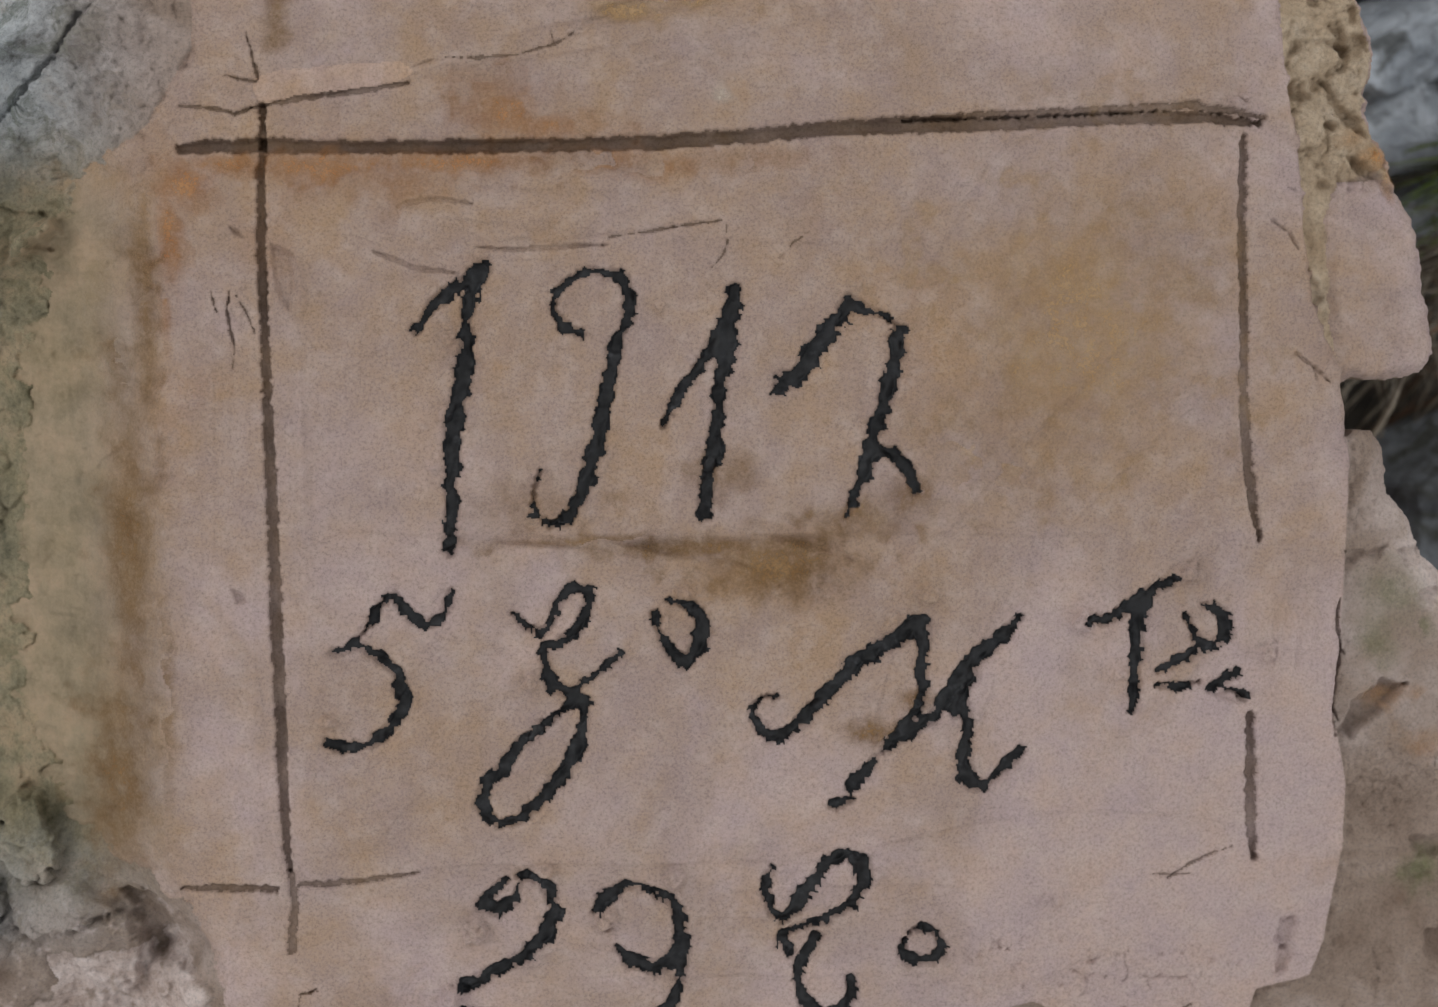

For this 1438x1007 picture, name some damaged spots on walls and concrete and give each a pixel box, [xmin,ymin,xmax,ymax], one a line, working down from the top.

flaking render [1272,0,1387,358]